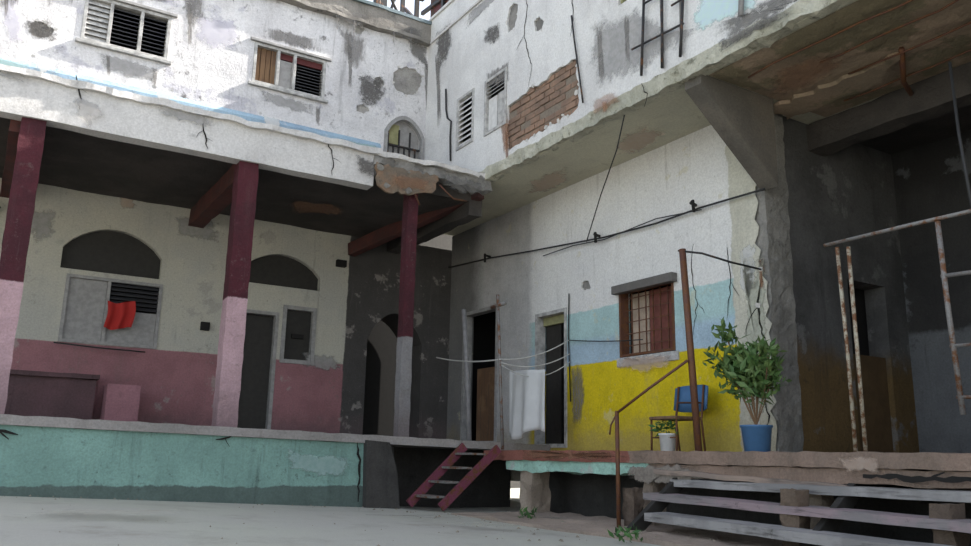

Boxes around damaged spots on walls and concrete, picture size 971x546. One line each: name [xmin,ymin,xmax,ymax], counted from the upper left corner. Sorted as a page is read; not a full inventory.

peeling [4,1,58,39]
crack [516,1,532,89]
flaking render [507,60,580,149]
spalling [374,162,467,205]
crack [691,244,704,335]
crack [727,250,766,339]
crack [0,429,18,440]